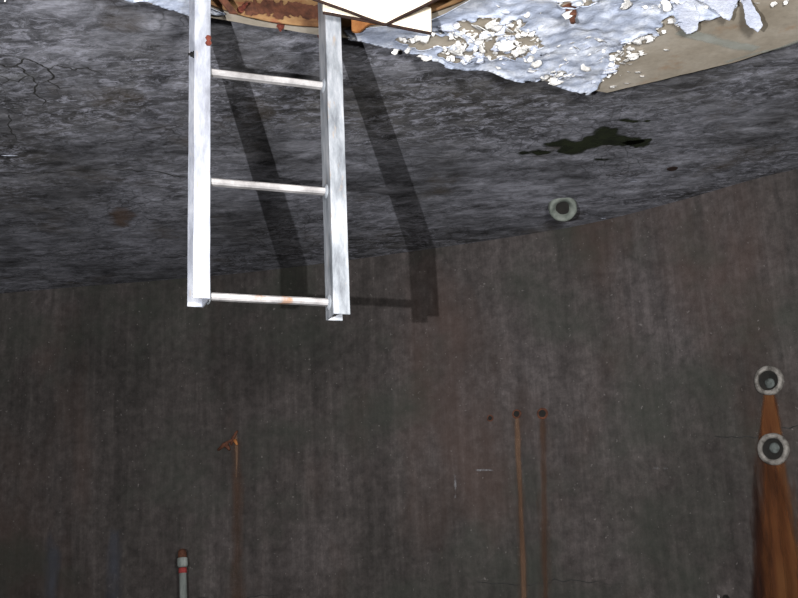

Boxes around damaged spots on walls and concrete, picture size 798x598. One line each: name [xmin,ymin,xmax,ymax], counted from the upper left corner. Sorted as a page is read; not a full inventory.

peeling [125,0,189,16]
rust [243,0,318,20]
peeling [345,0,763,95]
crack [0,58,102,108]
damp [519,119,652,155]
rust [760,395,781,438]
rust [515,418,526,598]
rust [752,461,798,598]